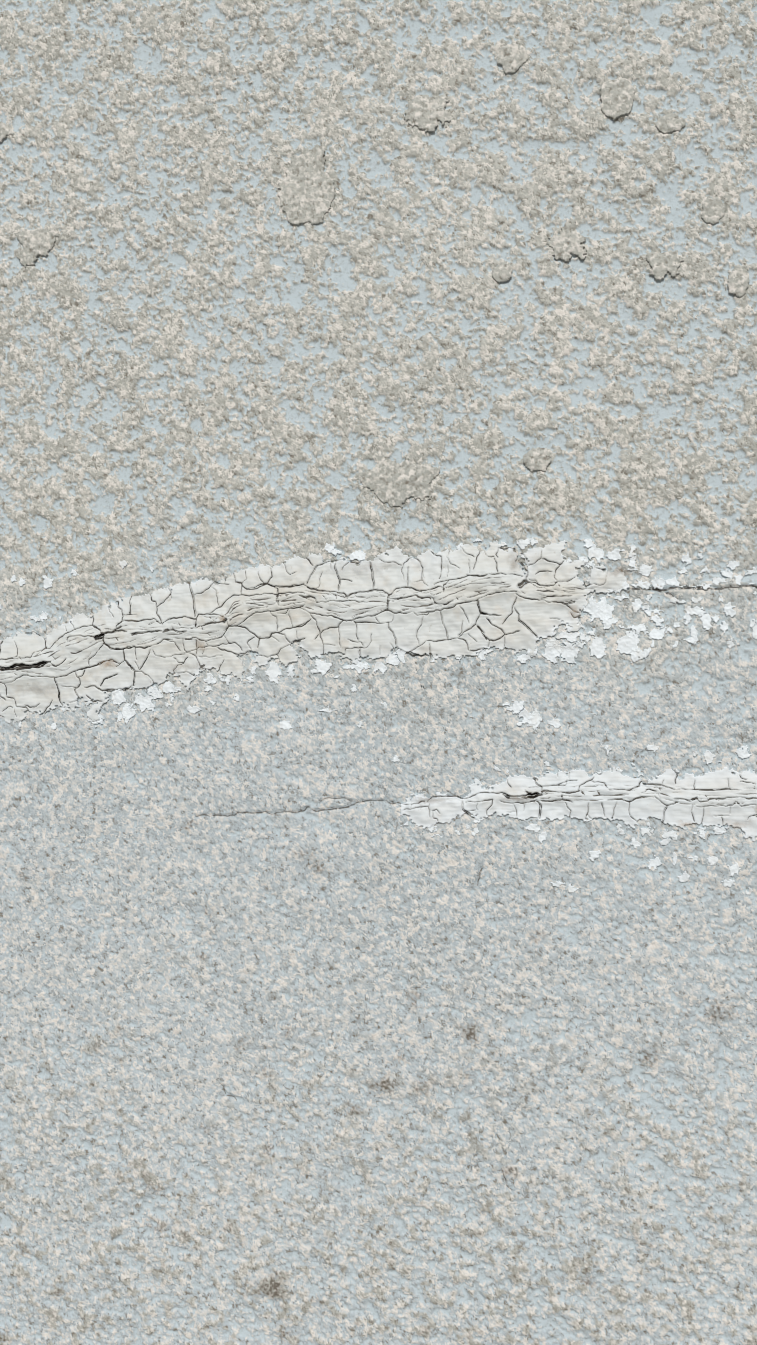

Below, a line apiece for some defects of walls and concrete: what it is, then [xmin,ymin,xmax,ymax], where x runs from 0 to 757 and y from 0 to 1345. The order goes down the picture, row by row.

crack [607,569,757,601]
peeling [727,561,757,595]
peeling [0,537,736,730]
crack [196,798,401,817]
peeling [399,745,757,895]